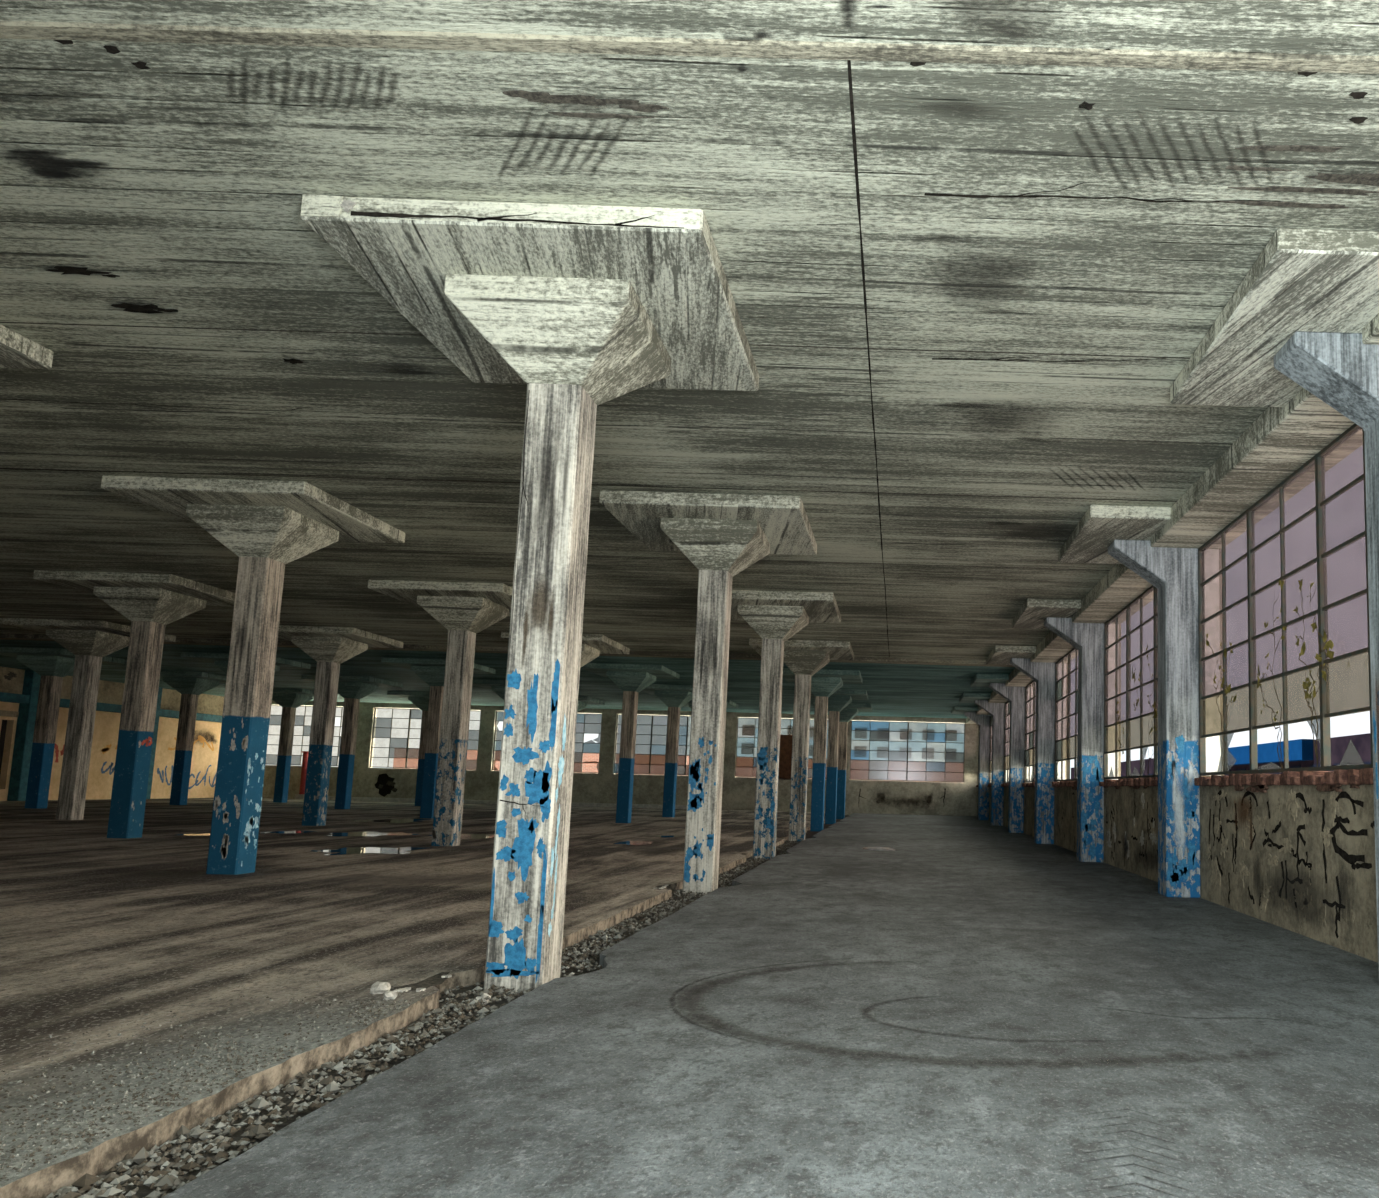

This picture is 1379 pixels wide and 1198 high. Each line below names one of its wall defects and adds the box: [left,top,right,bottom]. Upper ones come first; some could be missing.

damp [8,150,104,178]
crack [817,60,909,657]
peeling [212,713,265,866]
peeling [486,659,566,984]
peeling [653,828,714,890]
peeling [687,737,717,812]
peeling [755,748,774,834]
peeling [1055,735,1355,928]